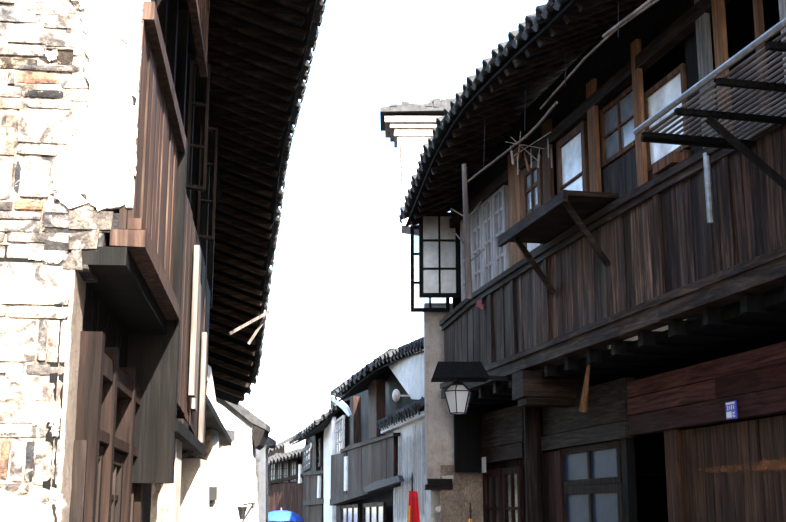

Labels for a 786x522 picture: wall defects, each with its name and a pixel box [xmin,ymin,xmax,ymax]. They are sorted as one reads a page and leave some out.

peeling [52,0,143,212]
peeling [31,251,65,264]
peeling [0,369,60,435]
water stain [205,429,242,502]
peeling [0,489,63,522]